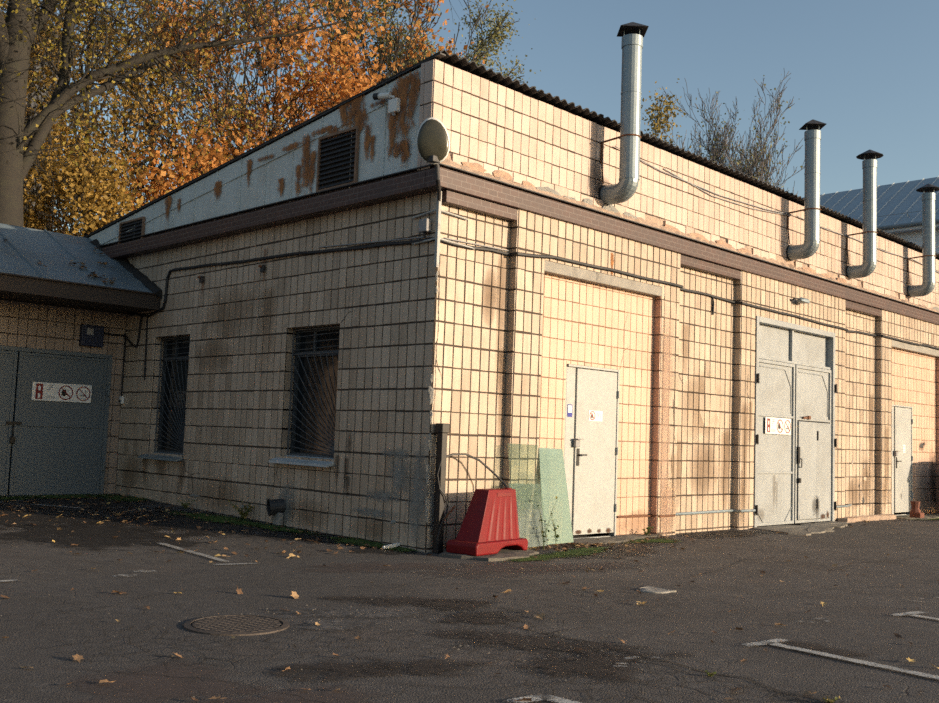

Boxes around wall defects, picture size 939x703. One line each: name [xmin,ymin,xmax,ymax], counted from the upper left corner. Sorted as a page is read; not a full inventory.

corrosion [246,69,421,197]